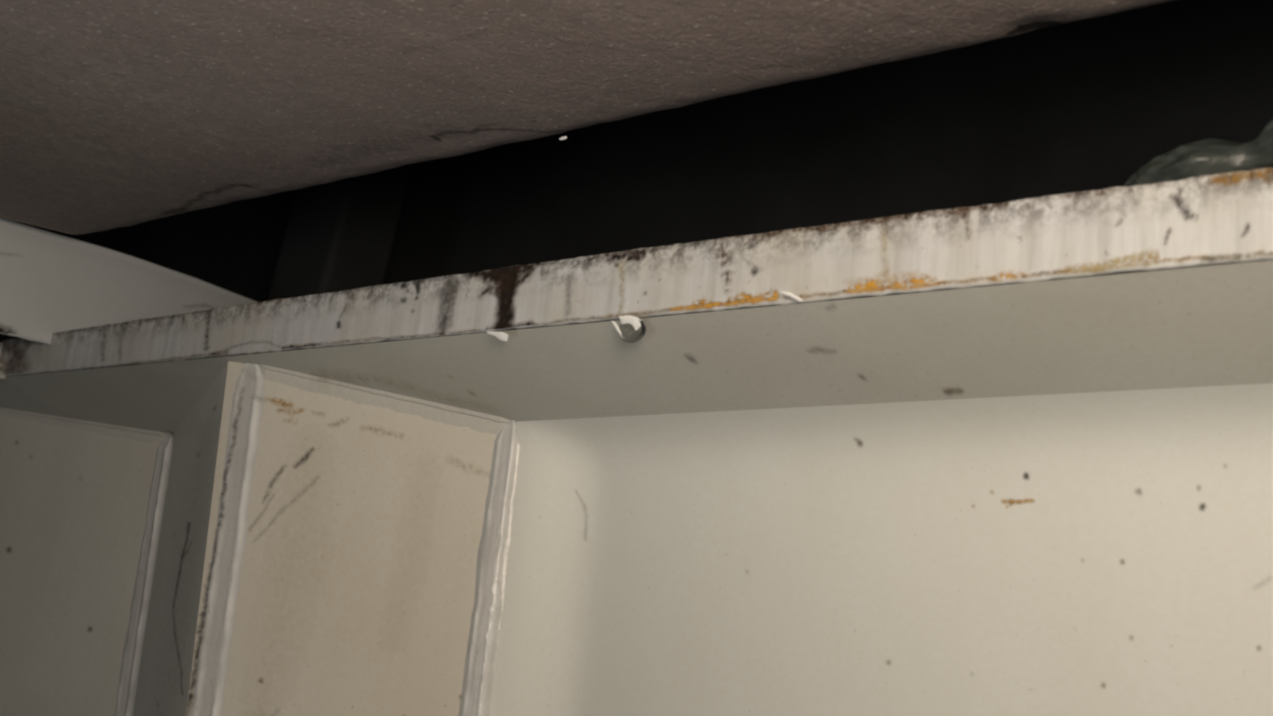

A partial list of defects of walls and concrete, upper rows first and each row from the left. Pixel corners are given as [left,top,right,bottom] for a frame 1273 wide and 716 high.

corrosion [824,253,1229,295]
corrosion [670,291,778,311]